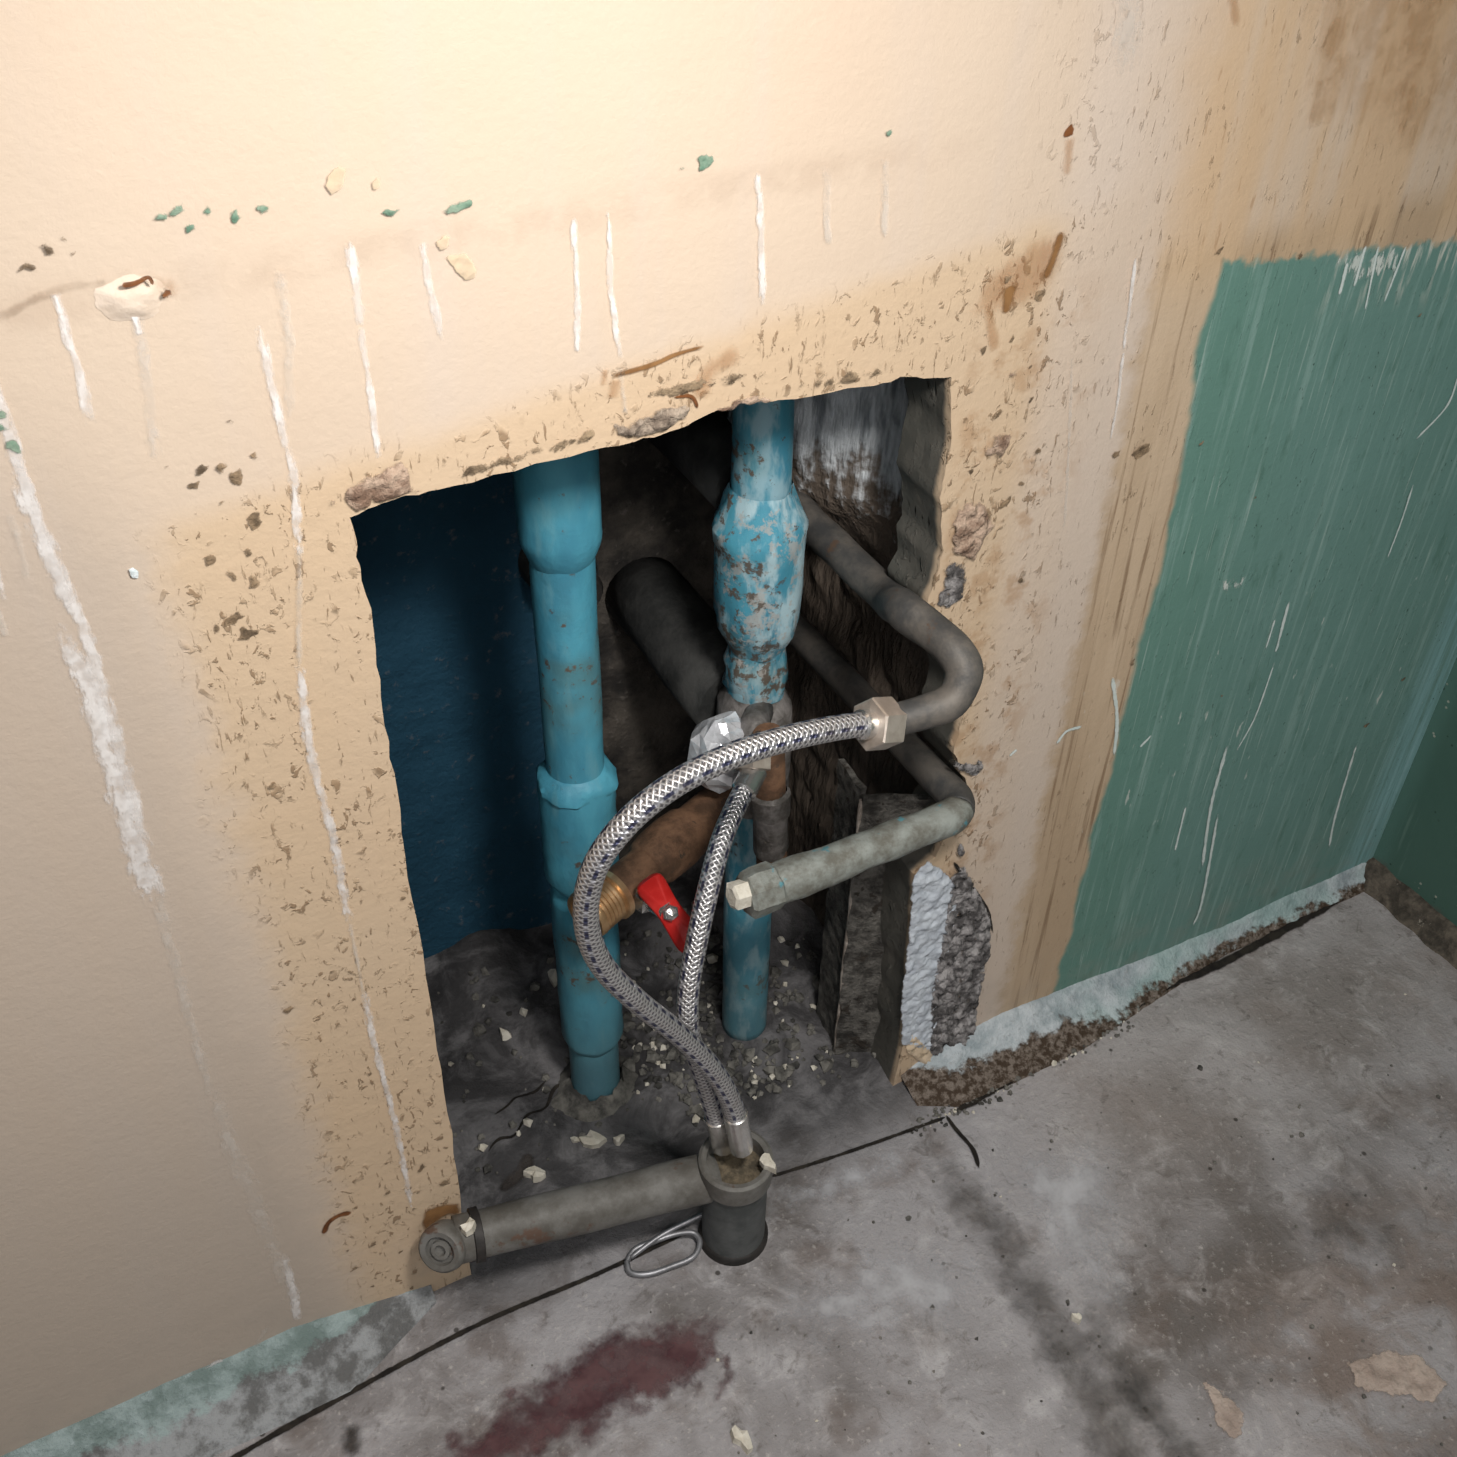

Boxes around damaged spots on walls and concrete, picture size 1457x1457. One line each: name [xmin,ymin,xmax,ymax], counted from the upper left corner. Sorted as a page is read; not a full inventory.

rust [1044,233,1063,277]
rust [1003,286,1016,313]
leakage [53,295,87,408]
leakage [0,394,22,465]
peeling [188,452,257,489]
flaking render [332,462,419,511]
flaking render [464,430,595,476]
flaking render [614,374,771,437]
flaking render [937,482,1025,608]
leakage [17,483,160,893]
flaking render [901,844,993,1064]
flaking render [460,1217,476,1237]